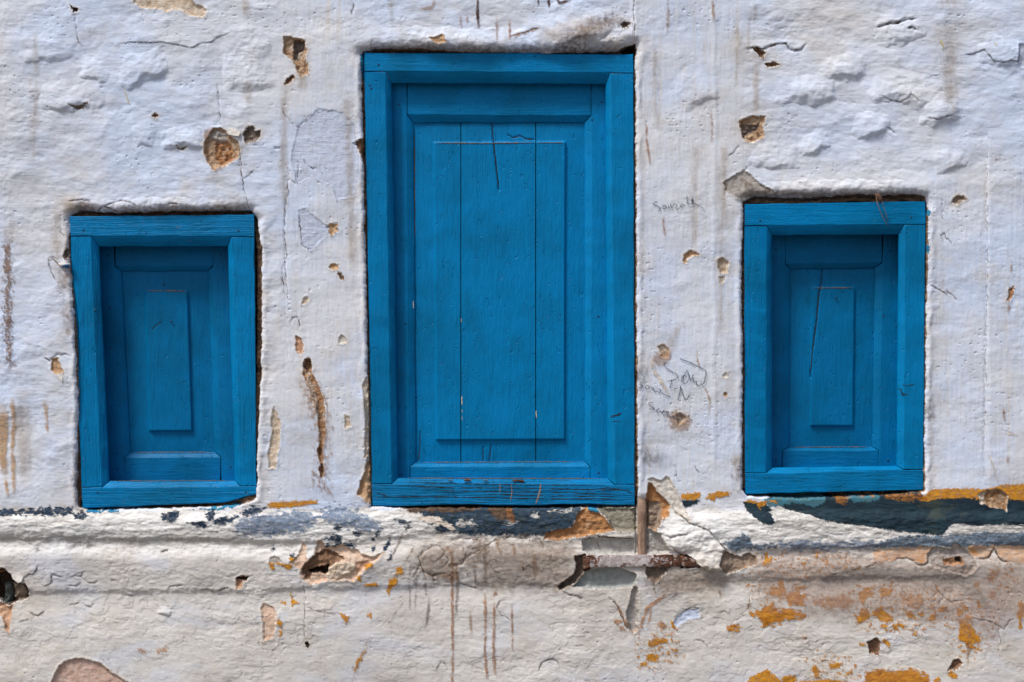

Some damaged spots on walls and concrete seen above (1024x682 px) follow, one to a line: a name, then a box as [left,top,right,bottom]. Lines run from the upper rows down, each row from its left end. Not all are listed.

spalling [283,36,310,76]
spalling [203,127,240,170]
spalling [739,115,766,142]
crack [281,161,313,325]
spalling [295,335,326,478]
peeling [829,491,880,504]
spalling [978,489,1024,533]
spalling [269,537,399,595]
spalling [719,551,811,627]
spalling [927,542,1018,597]
spalling [51,658,128,682]
peeling [781,662,853,682]